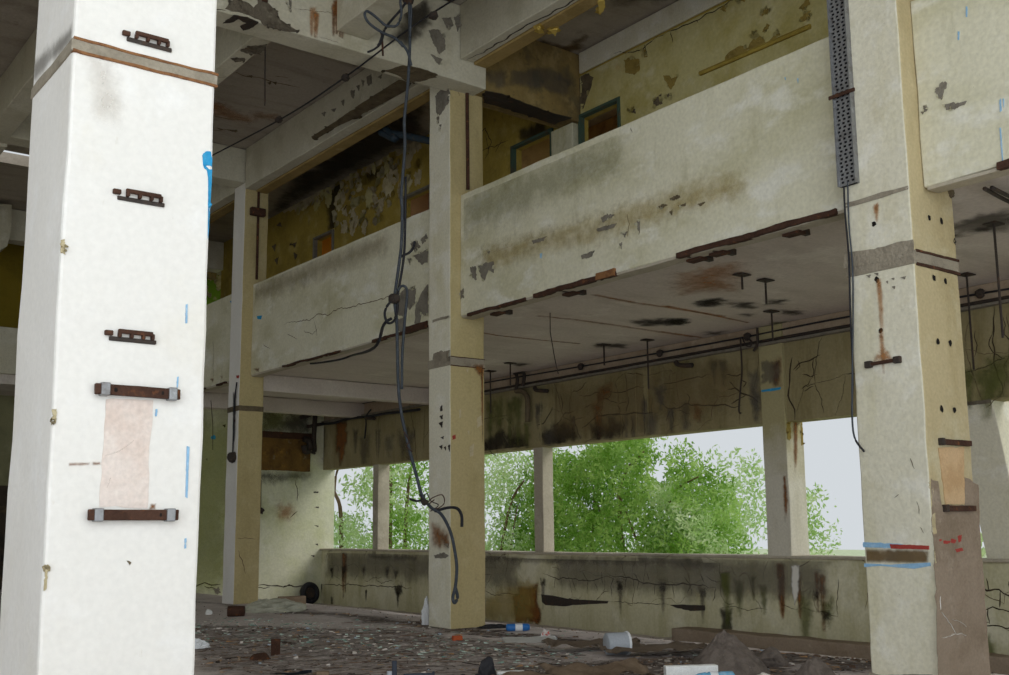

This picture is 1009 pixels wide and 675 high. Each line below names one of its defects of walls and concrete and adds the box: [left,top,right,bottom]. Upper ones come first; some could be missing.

spalling [223,0,299,33]
peeling [725,5,780,60]
spalling [311,13,462,140]
peeling [935,81,967,111]
crack [965,308,1009,408]
water stain [484,399,529,451]
mould [542,423,577,444]
crack [538,355,760,443]
crack [485,550,839,616]
water stain [720,575,766,630]
water stain [792,565,810,636]
crack [985,579,1009,631]